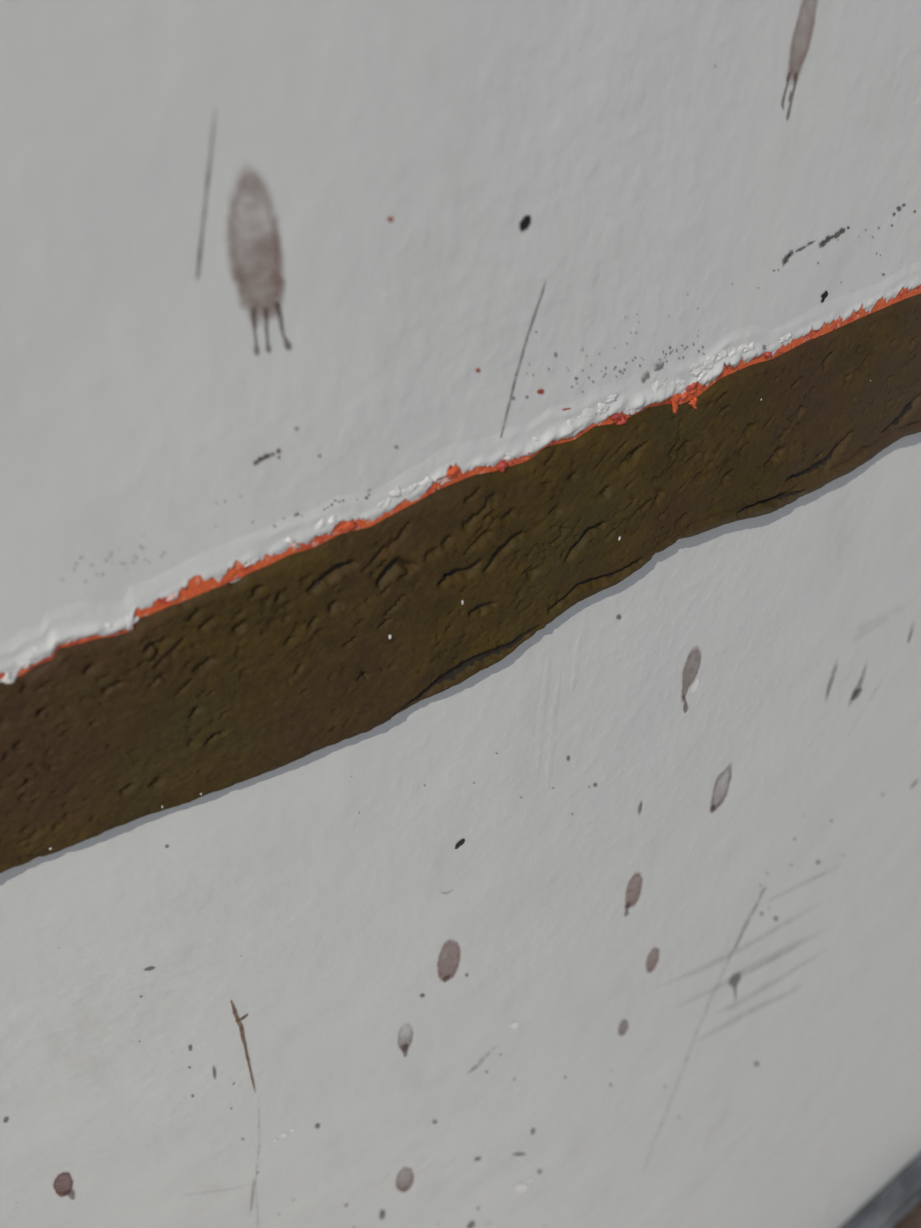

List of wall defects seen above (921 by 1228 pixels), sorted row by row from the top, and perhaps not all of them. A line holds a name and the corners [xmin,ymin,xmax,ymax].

peeling [0,262,921,683]